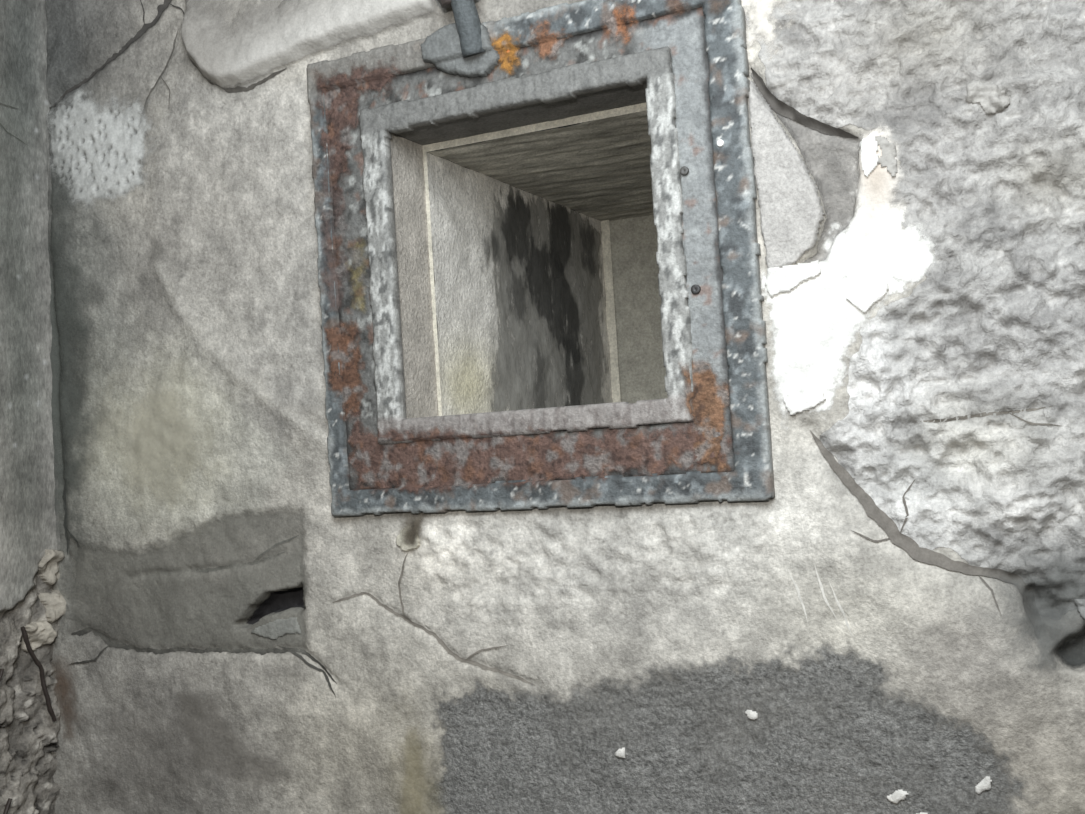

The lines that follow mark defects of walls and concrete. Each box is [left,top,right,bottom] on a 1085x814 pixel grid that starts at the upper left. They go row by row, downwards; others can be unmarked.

crack [0,0,184,145]
corrosion [492,32,520,74]
corrosion [603,5,637,43]
corrosion [316,64,400,310]
damp [491,185,609,412]
spalling [741,0,1085,588]
corrosion [324,321,733,494]
spalling [0,549,66,814]
spalling [247,587,306,640]
crack [333,553,534,685]
crack [810,430,1040,637]
spalling [1056,637,1085,668]